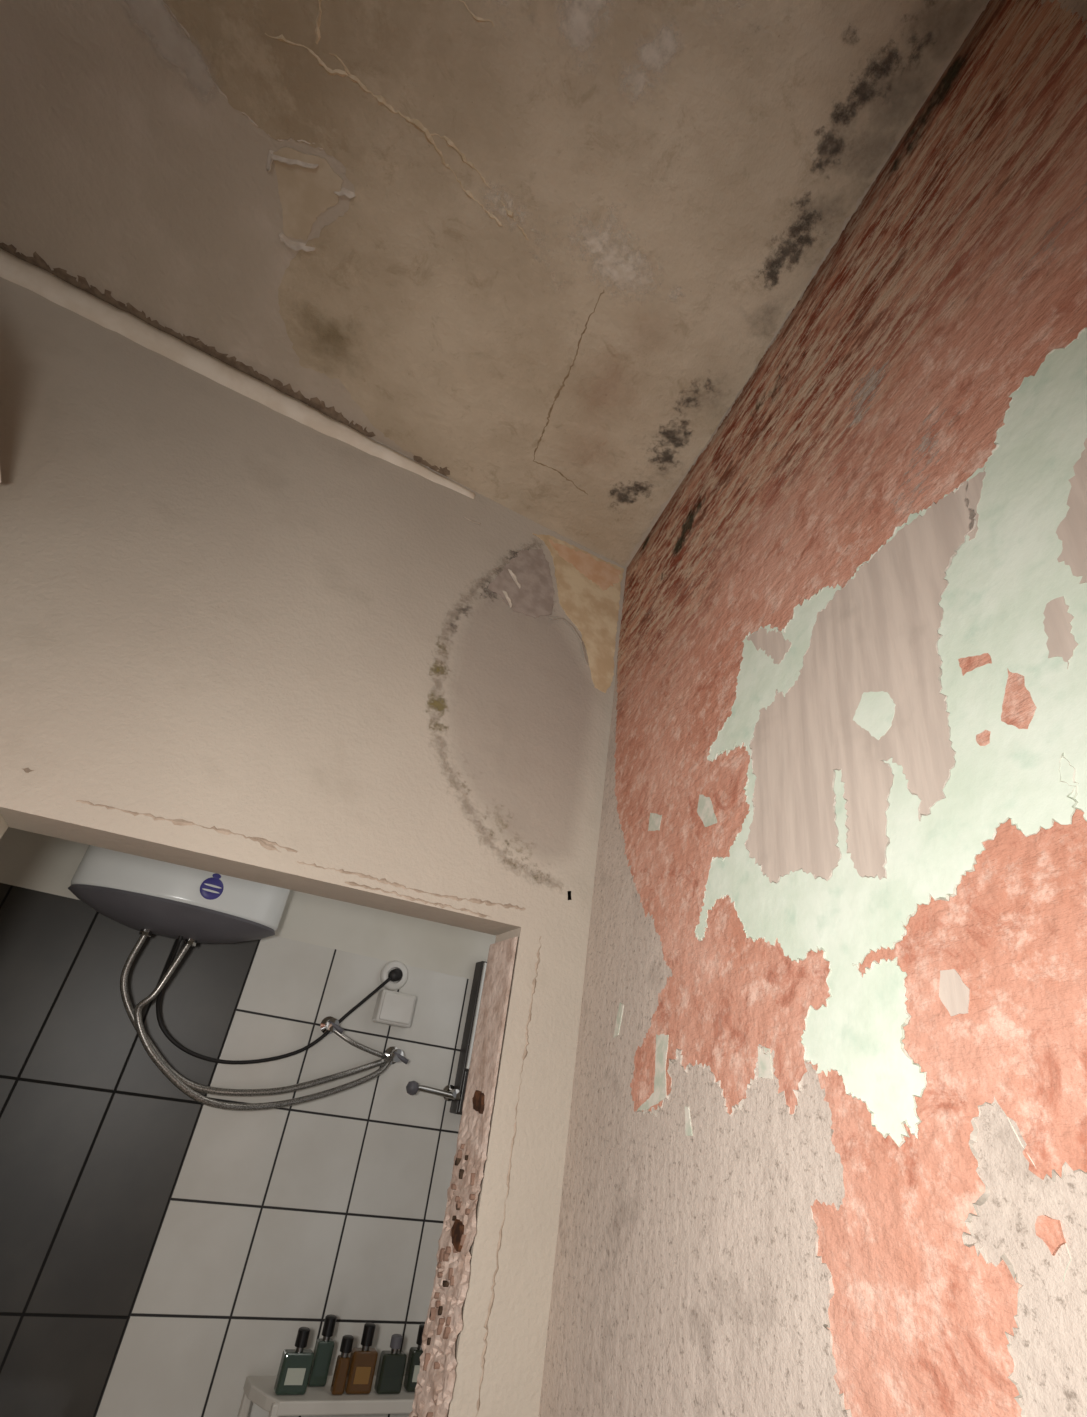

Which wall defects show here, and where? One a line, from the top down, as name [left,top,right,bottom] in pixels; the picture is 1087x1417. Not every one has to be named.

crack [265,0,529,240]
water stain [816,39,929,168]
water stain [891,56,965,172]
peeling [126,0,988,566]
water stain [766,201,813,285]
water stain [611,484,647,503]
water stain [653,421,691,463]
water stain [673,496,706,554]
spalling [533,533,624,693]
water stain [429,695,447,728]
peeling [613,0,1087,1417]
spalling [423,1144,476,1371]